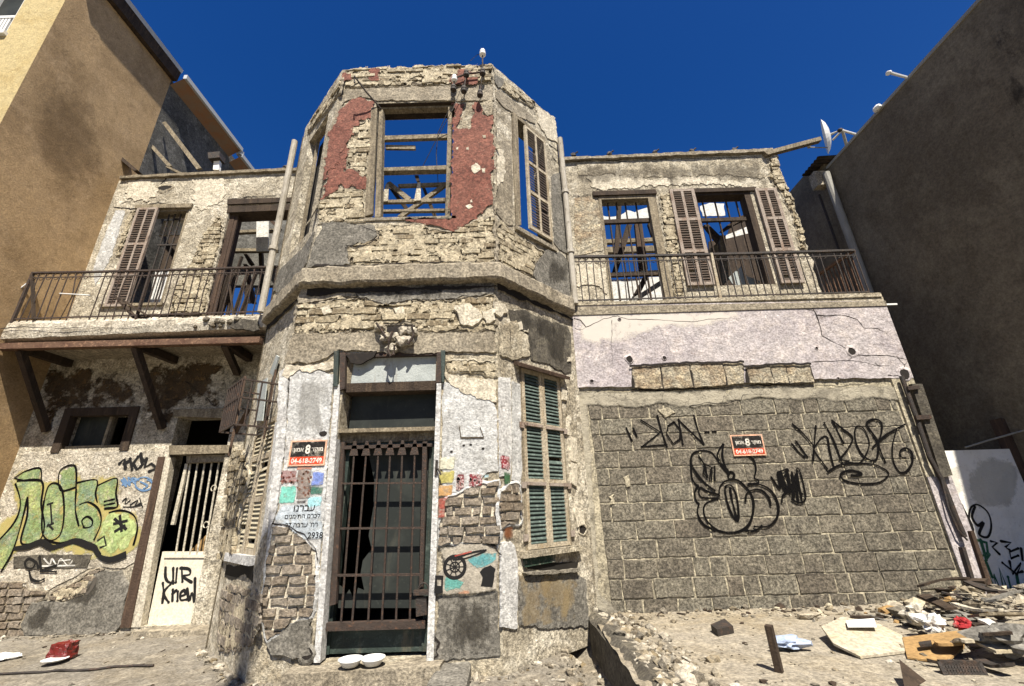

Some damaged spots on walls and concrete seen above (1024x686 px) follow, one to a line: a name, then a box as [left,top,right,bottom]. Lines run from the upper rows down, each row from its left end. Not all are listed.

flaking render [307,63,536,134]
flaking render [347,119,371,176]
flaking render [115,210,136,257]
flaking render [317,188,545,278]
flaking render [293,294,530,379]
crack [579,308,909,407]
leakage [43,362,225,432]
flaking render [437,479,524,552]
flaking render [0,567,104,637]
flaking render [217,525,320,654]